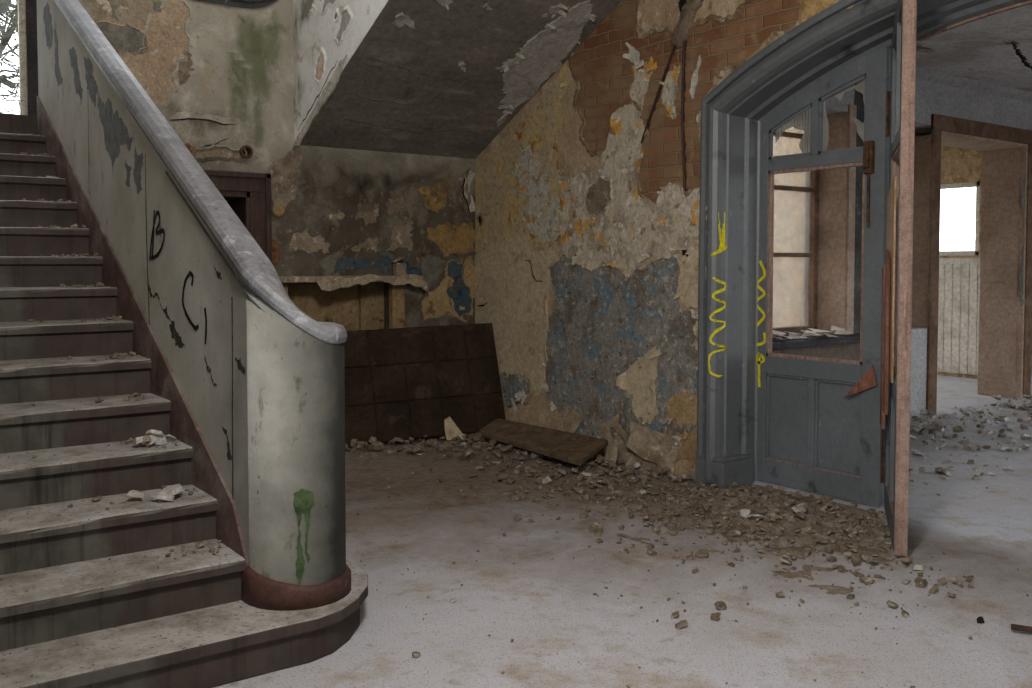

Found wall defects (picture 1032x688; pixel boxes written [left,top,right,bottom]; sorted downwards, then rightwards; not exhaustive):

peeling [43,2,144,194]
peeling [80,0,194,109]
water stain [230,20,279,93]
water stain [294,0,313,41]
peeling [269,0,354,216]
peeling [854,82,865,147]
crack [1001,42,1032,77]
peeling [289,0,801,467]
peeling [853,166,863,334]